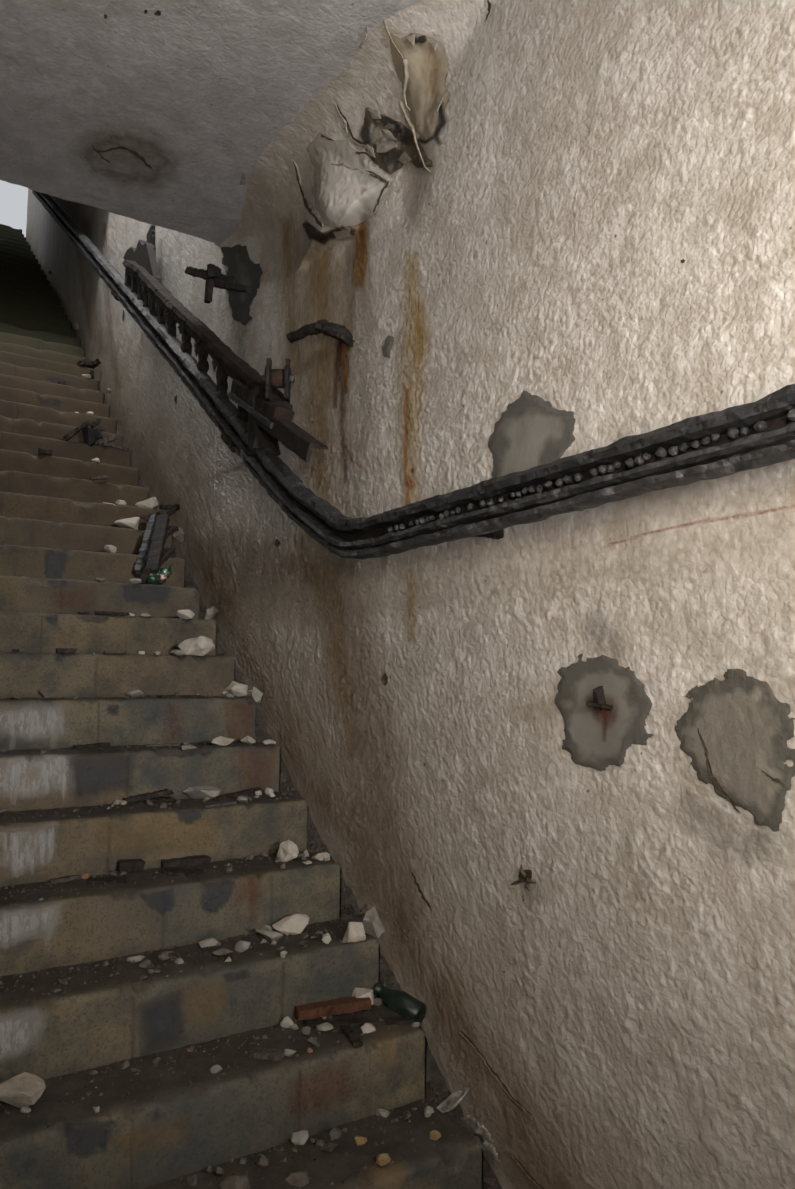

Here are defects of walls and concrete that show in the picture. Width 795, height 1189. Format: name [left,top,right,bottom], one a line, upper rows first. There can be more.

flaking render [360,33,450,174]
spalling [303,222,355,243]